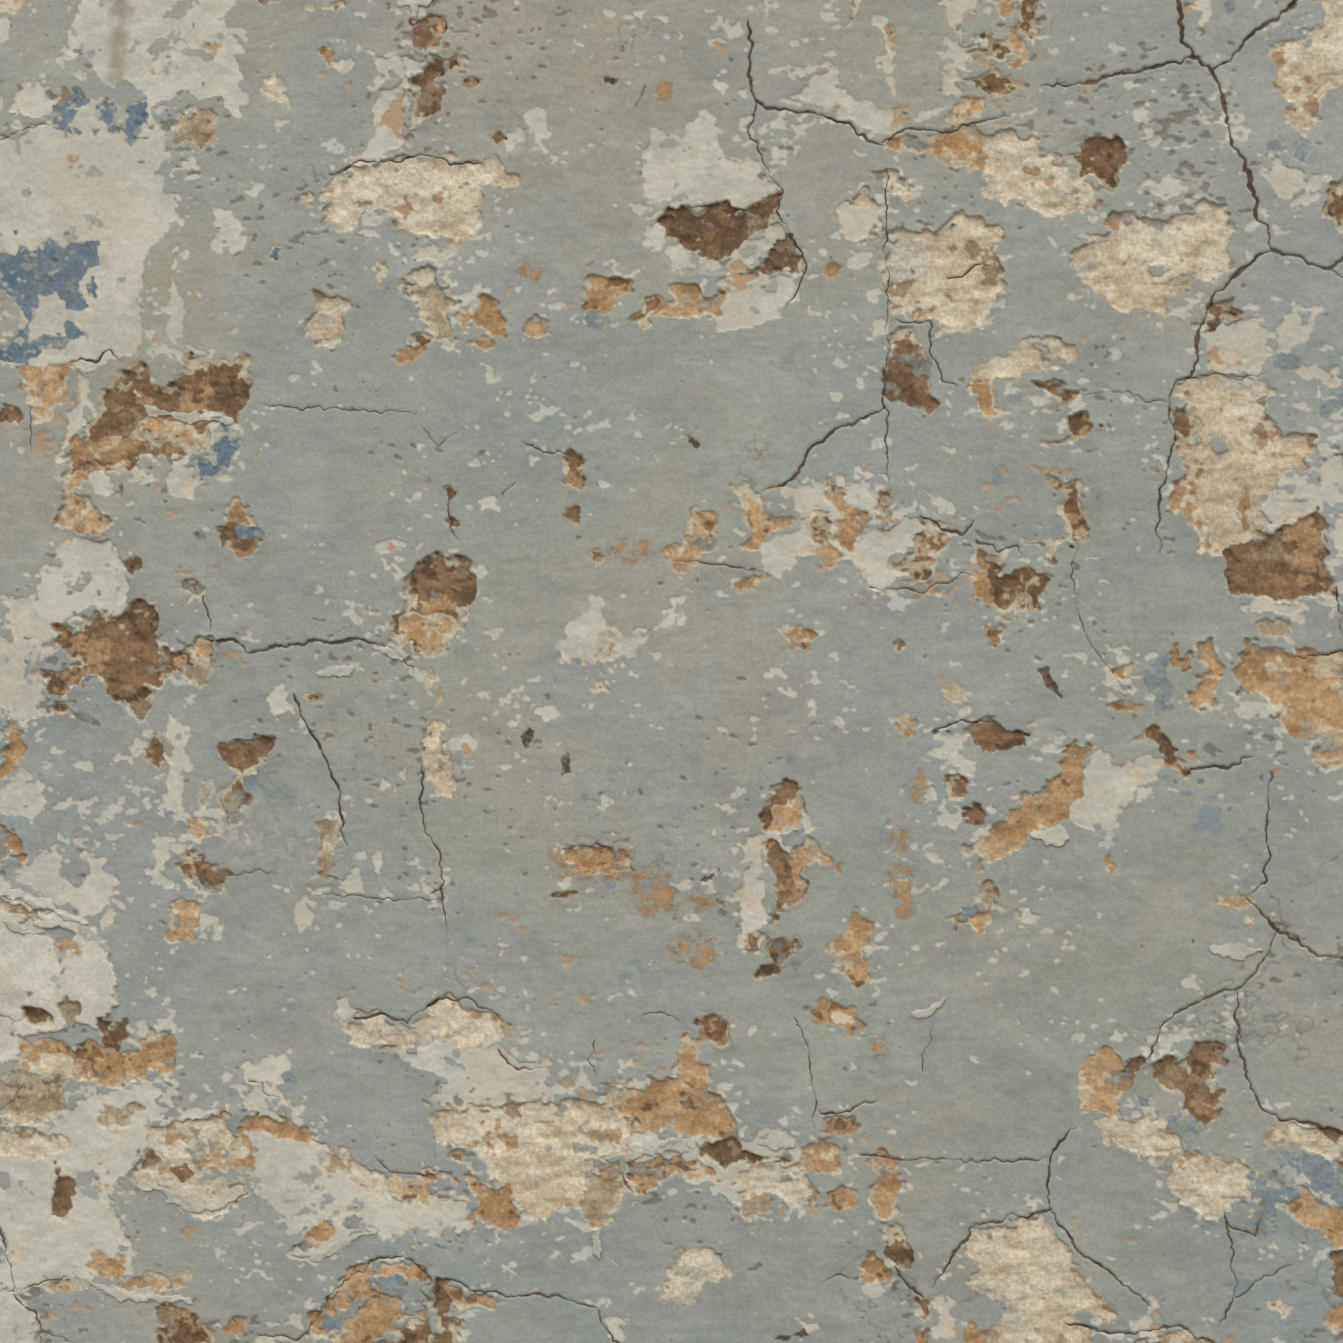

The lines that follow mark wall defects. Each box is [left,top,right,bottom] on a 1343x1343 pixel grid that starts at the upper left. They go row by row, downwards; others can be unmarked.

spalling [289,0,552,365]
peeling [582,109,803,333]
crack [692,21,961,493]
spalling [790,0,1236,318]
crack [1041,0,1343,549]
peeling [0,0,355,944]
spalling [1169,298,1343,771]
crack [293,695,347,844]
crack [307,765,448,937]
crack [1143,773,1343,1135]
peeling [0,989,915,1343]
crack [858,1128,1293,1343]